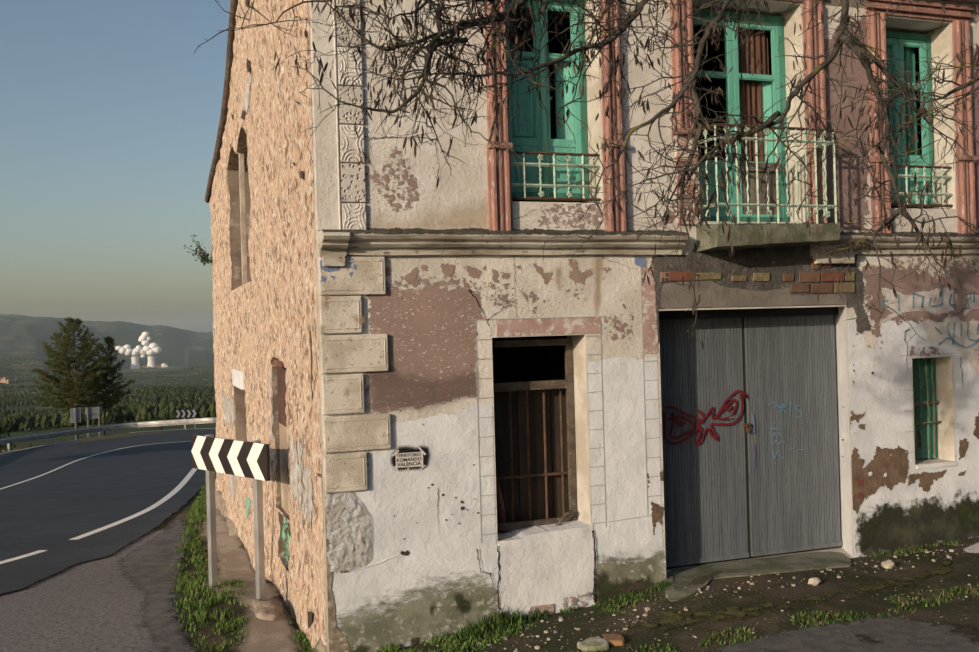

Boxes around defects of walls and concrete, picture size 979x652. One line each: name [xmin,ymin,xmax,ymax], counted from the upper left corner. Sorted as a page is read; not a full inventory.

crack [364,105,483,179]
peeling [970,46,979,230]
peeling [365,146,418,212]
peeling [564,258,611,300]
peeling [783,255,979,349]
peeling [365,263,553,414]
flaking render [843,407,866,430]
flaking render [959,412,979,460]
flaking render [842,446,946,514]
damp [855,491,979,557]
flaking render [315,473,374,652]
crack [476,546,501,613]